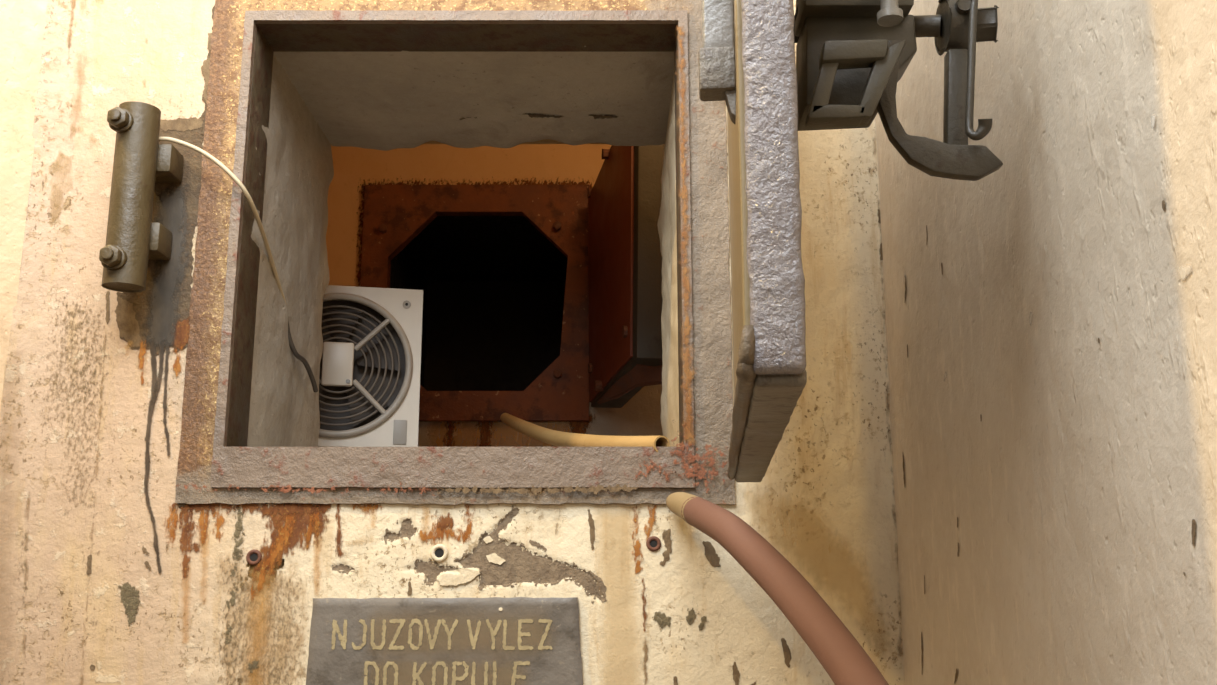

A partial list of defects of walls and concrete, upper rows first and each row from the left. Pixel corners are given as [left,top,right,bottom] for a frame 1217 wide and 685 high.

corrosion [138,340,147,385]
leakage [142,186,188,573]
corrosion [166,26,727,598]
peeling [118,582,140,626]
leakage [220,546,298,685]
peeling [407,505,607,604]